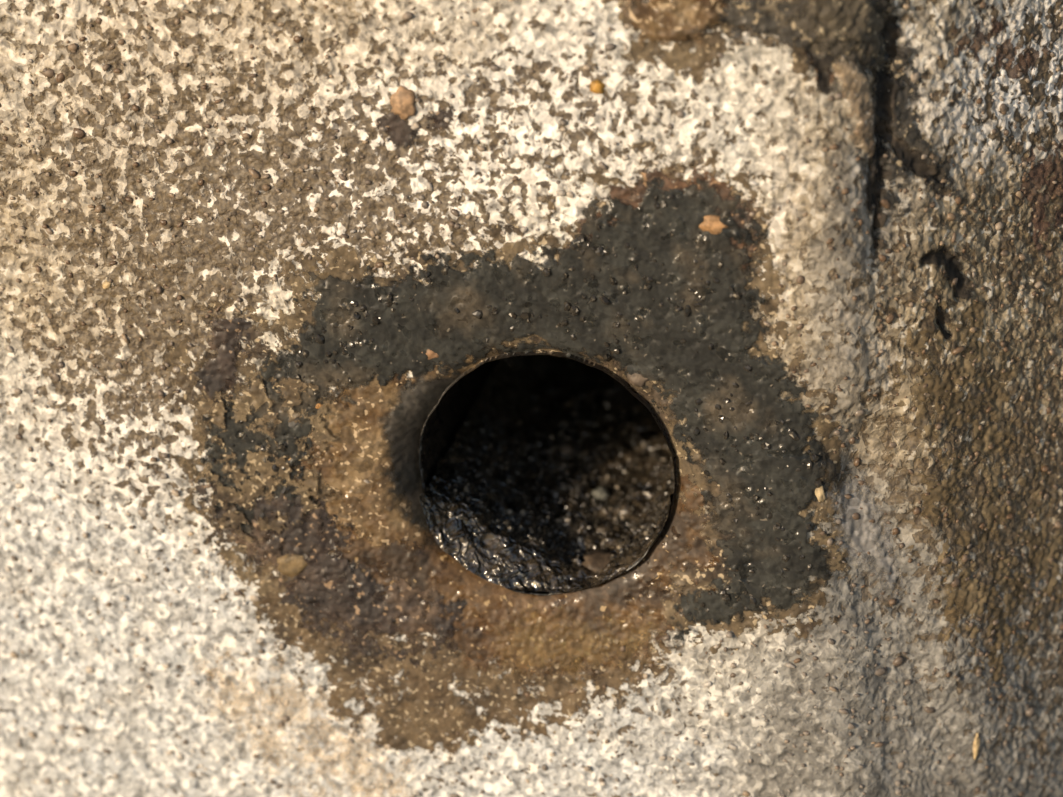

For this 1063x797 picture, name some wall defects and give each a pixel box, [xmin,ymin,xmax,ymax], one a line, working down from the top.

leakage [601,0,913,109]
crack [808,53,835,94]
crack [855,15,959,249]
leakage [183,139,867,659]